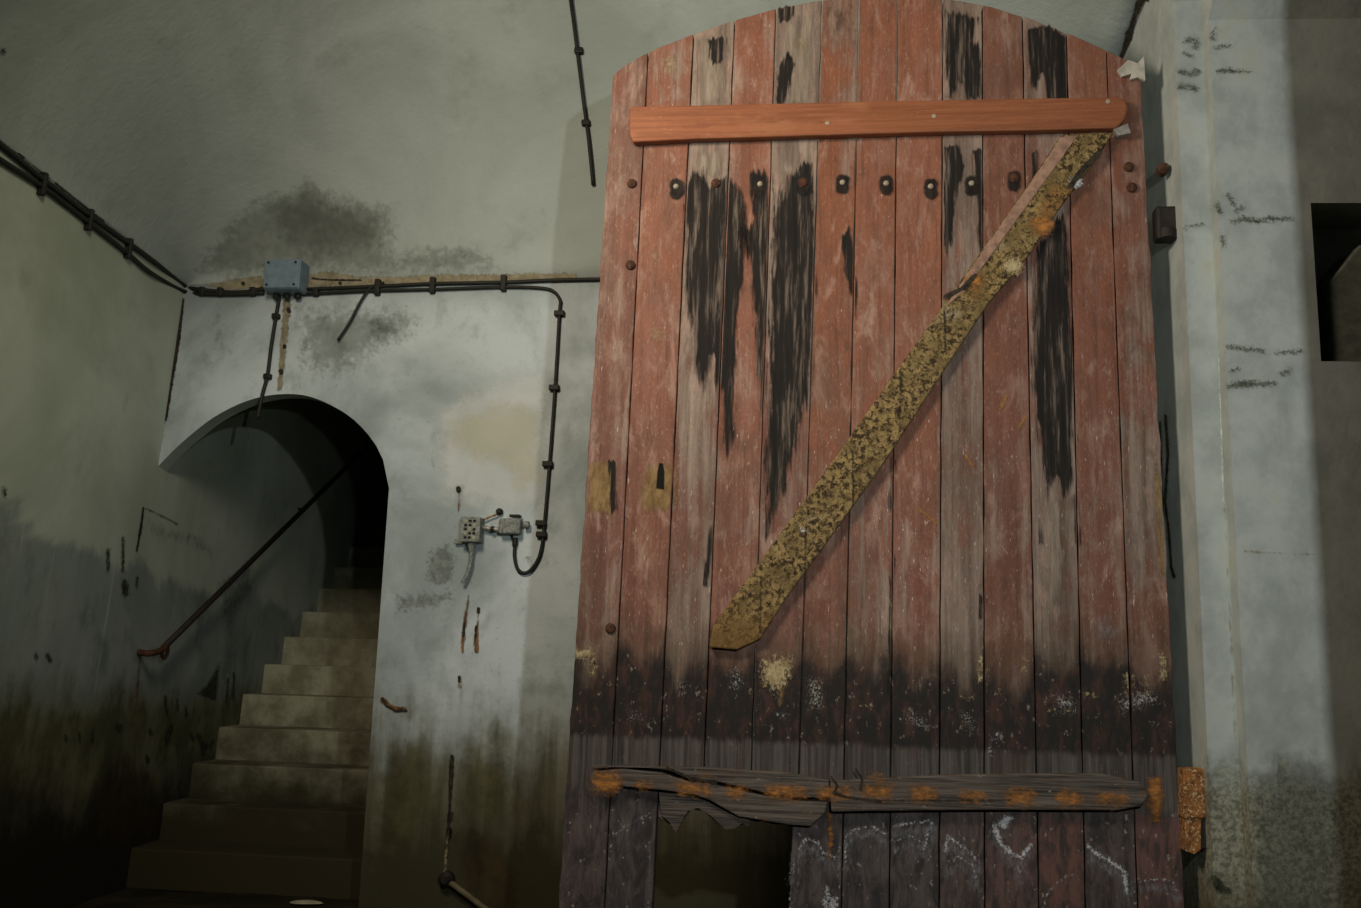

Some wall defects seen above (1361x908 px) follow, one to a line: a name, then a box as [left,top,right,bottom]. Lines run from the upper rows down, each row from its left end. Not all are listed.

water stain [106,537,139,596]
rust [461,596,480,653]
water stain [1210,875,1230,894]